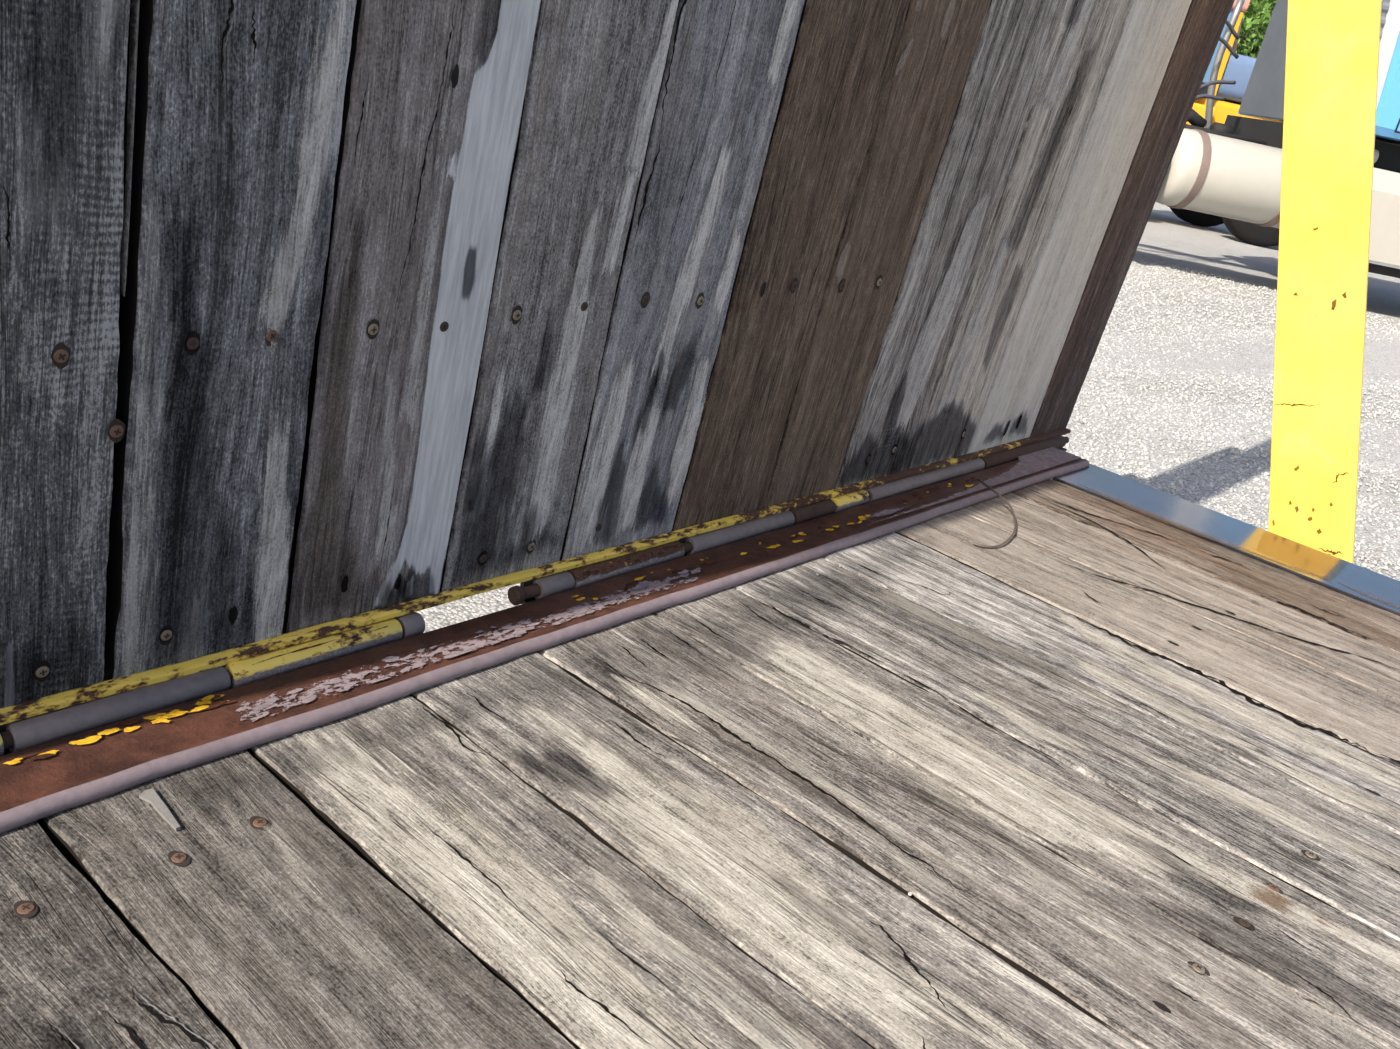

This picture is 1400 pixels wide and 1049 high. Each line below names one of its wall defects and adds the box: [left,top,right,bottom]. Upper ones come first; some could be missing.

crack [220,0,257,102]
peeling [3,558,717,765]
crack [40,1019,81,1049]
crack [107,983,214,1049]